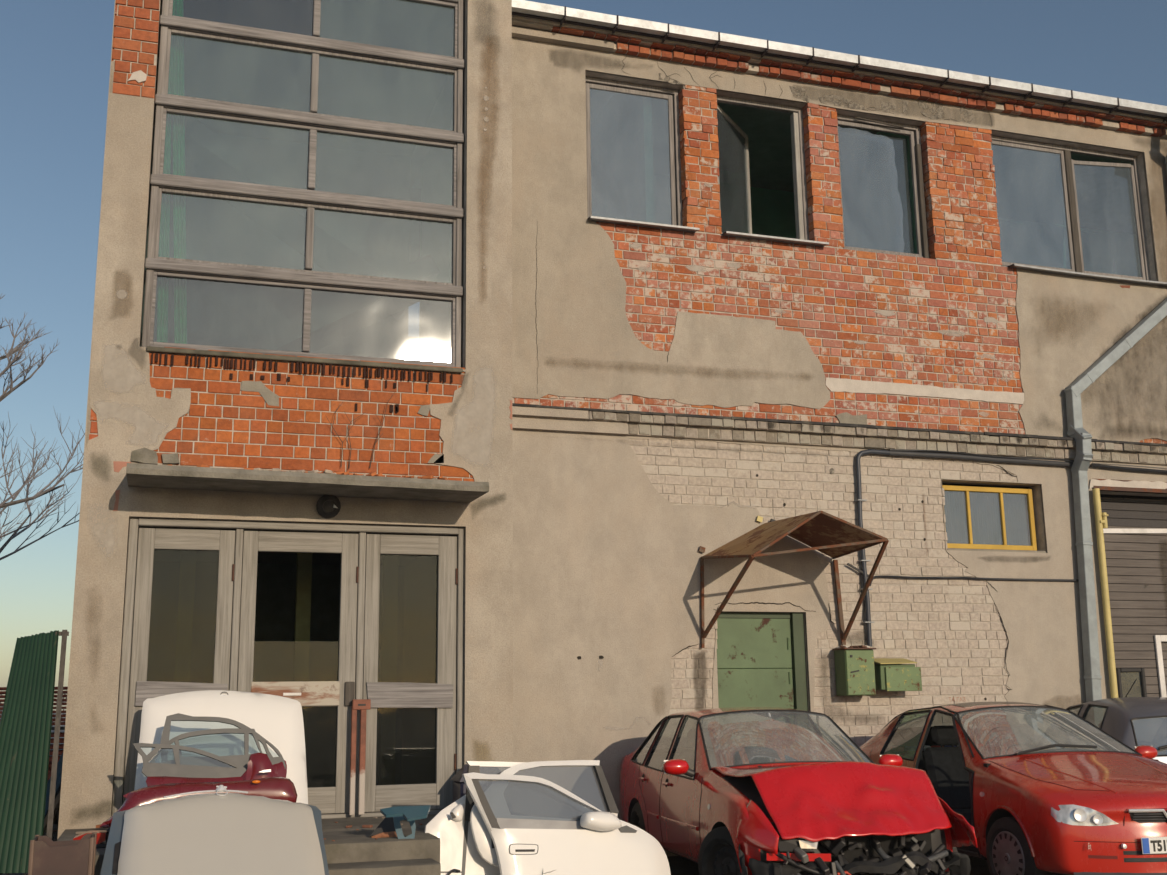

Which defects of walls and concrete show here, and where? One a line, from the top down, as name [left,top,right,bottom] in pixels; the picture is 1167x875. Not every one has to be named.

flaking render [112,0,161,100]
flaking render [89,409,98,440]
flaking render [113,347,475,482]
flaking render [509,26,1167,761]
crack [988,583,1012,690]